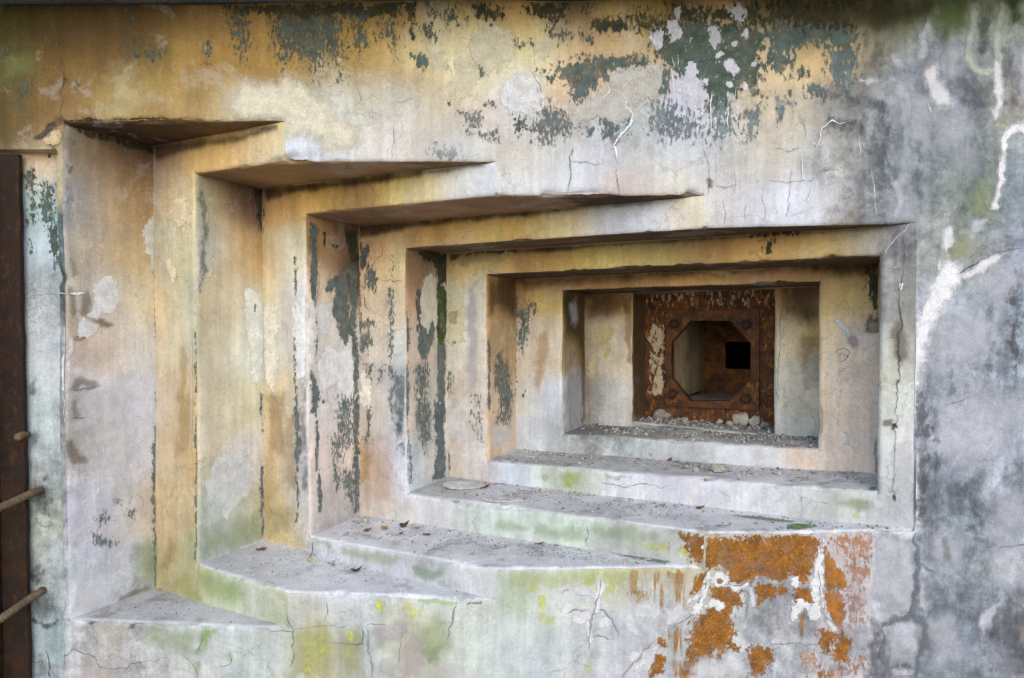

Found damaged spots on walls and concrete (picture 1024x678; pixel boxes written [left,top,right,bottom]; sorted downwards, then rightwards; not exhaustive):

crack [567,82,641,195]
peeling [649,6,693,50]
peeling [673,61,710,137]
peeling [708,1,757,90]
water stain [892,180,904,218]
water stain [971,123,1024,233]
crack [885,222,912,501]
water stain [888,226,1019,541]
crack [559,571,769,678]
corrosion [626,530,877,678]
crack [880,533,935,678]
water stain [979,599,1002,631]